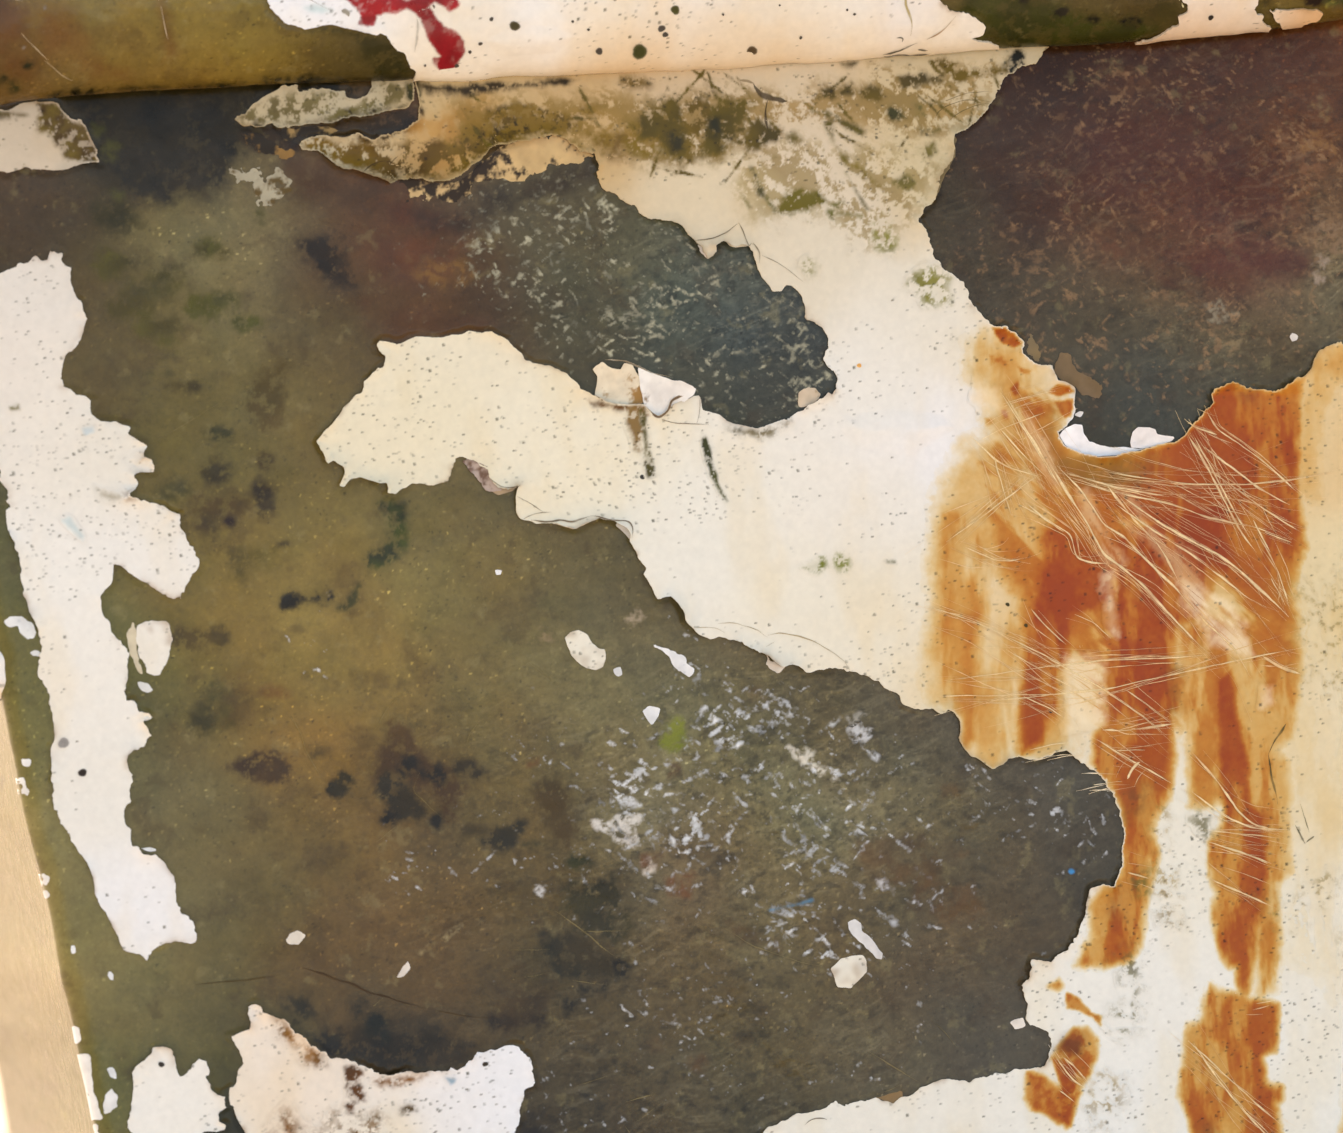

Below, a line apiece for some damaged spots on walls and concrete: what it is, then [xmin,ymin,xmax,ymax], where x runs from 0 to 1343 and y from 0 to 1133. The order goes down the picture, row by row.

peeling [76,0,371,91]
peeling [940,0,997,45]
leakage [236,47,1028,264]
corrosion [342,216,502,344]
mould [796,254,823,282]
mould [902,259,957,311]
peeling [969,0,1343,457]
peeling [0,58,1128,1133]
corrosion [914,57,1343,1133]
corrosion [847,824,993,932]
corrosion [722,915,788,958]